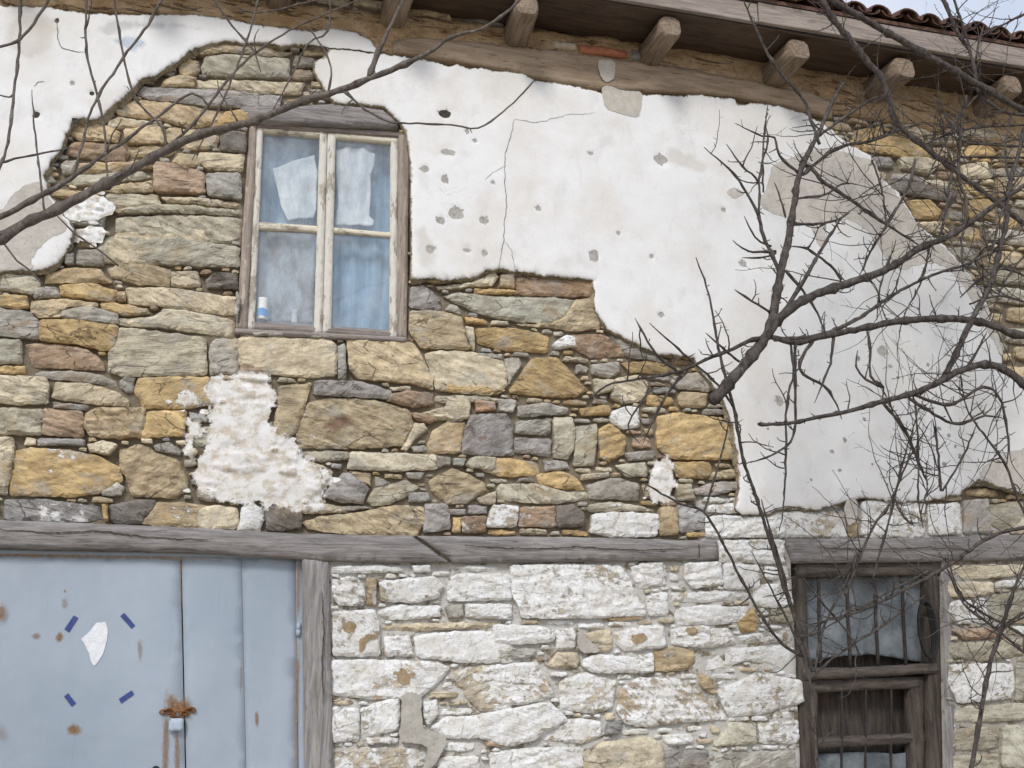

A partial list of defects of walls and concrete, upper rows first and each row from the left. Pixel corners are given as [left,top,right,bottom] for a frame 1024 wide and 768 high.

peeling [0,40,386,276]
spalling [436,205,464,225]
crack [485,113,591,268]
spalling [654,153,668,166]
peeling [760,146,1003,355]
peeling [410,269,740,515]